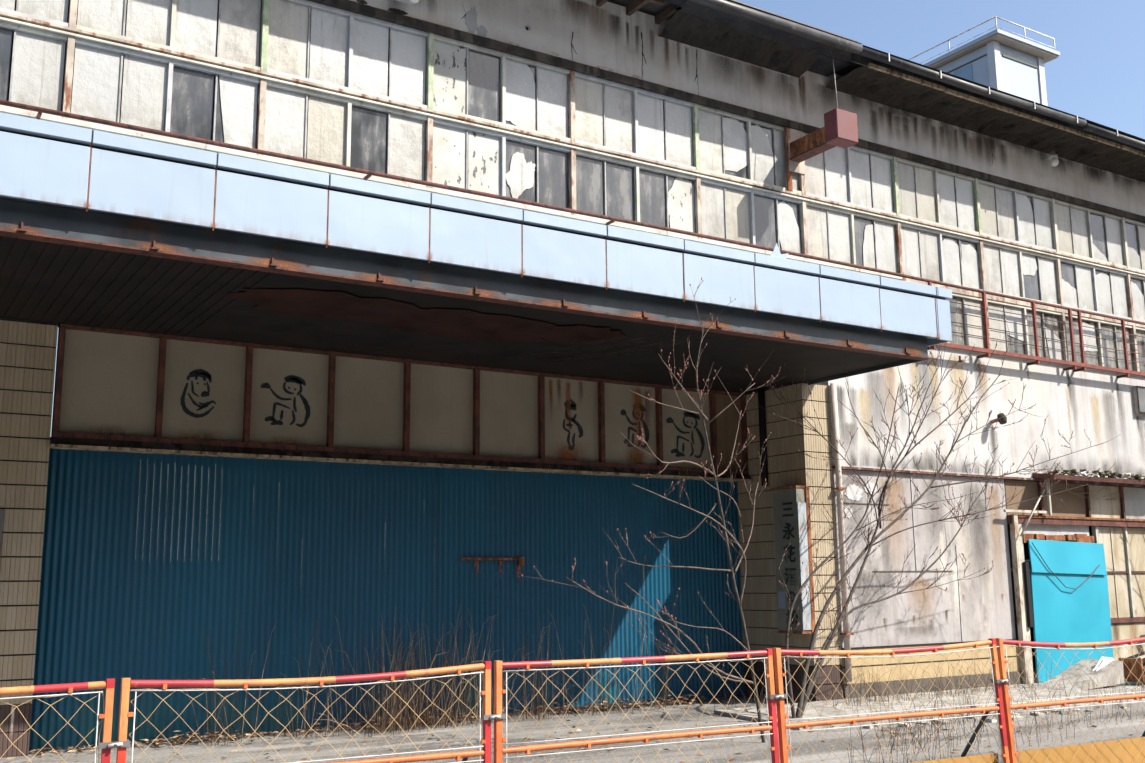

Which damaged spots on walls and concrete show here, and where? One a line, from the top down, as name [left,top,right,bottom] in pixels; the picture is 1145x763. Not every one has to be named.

leakage [568,0,638,37]
leakage [852,95,1144,184]
corrosion [258,261,298,269]
leakage [838,368,903,411]
leakage [848,459,992,515]
leakage [940,533,957,589]